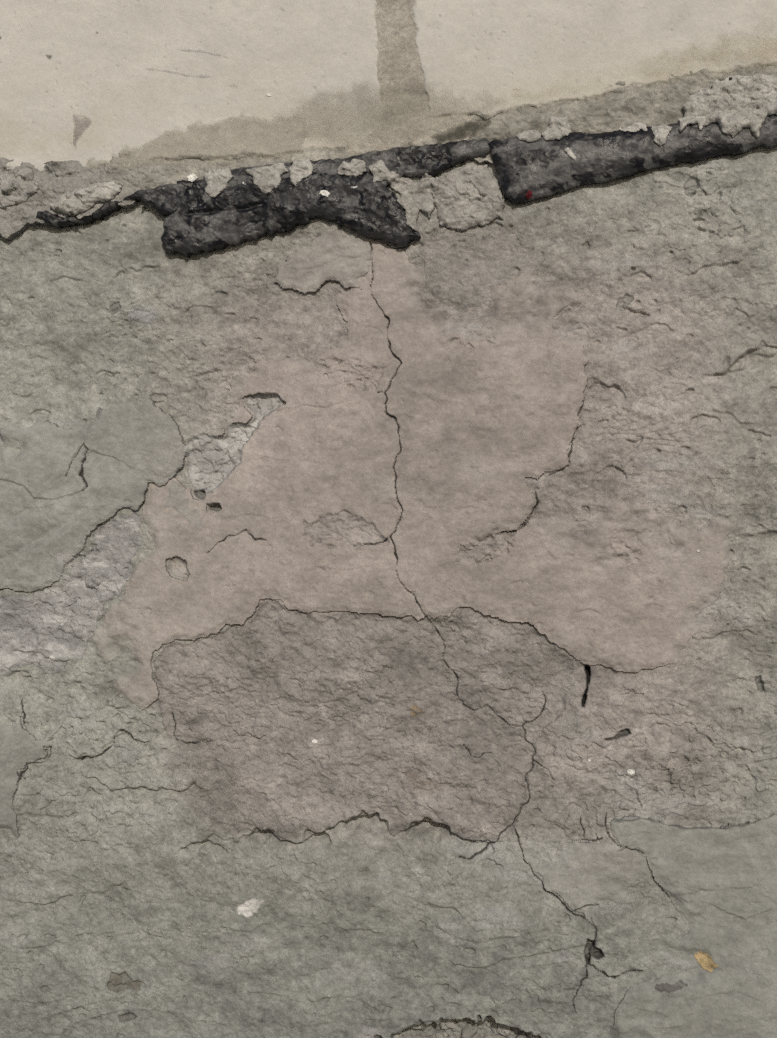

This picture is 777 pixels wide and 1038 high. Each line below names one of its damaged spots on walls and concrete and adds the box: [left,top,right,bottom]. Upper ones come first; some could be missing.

crack [65,443,88,491]
spalling [184,395,286,511]
crack [370,242,643,1012]
spalling [154,601,591,841]
damp [358,1029,380,1038]